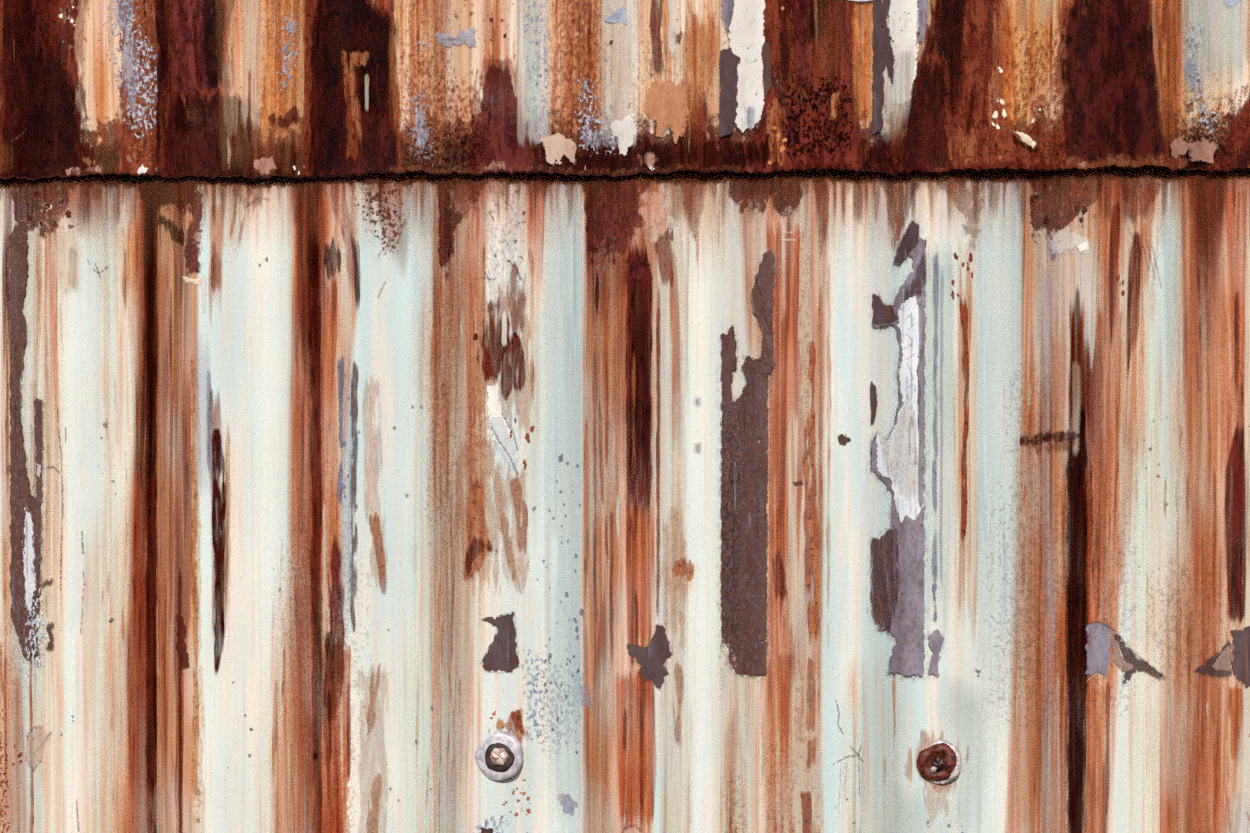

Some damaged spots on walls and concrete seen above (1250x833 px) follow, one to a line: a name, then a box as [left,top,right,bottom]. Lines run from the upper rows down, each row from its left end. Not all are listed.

peeling [719,0,772,137]
peeling [872,0,928,134]
peeling [9,222,54,666]
rust [176,615,189,669]
rust [212,430,226,671]
rust [324,538,344,718]
peeling [482,612,546,742]
rust [0,0,1250,627]
peeling [720,249,775,676]
rust [781,231,819,643]
peeling [870,220,944,676]
rust [1067,283,1094,833]